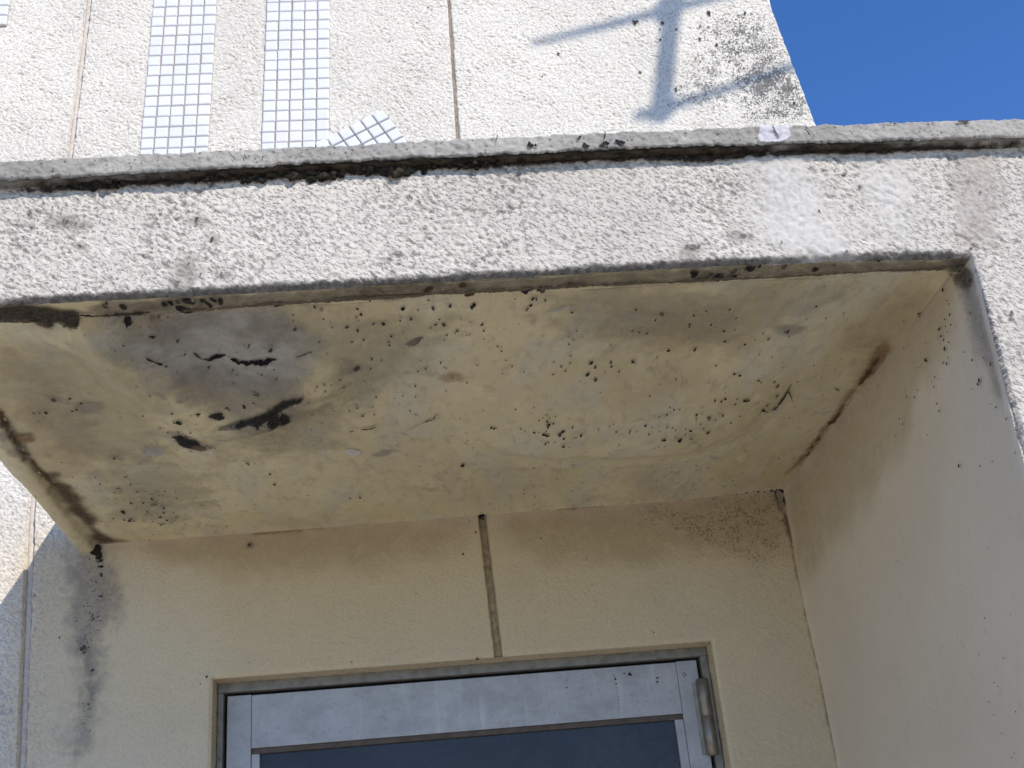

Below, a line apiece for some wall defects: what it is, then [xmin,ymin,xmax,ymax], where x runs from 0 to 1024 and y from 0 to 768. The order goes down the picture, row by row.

water stain [0,298,320,397]
peeling [159,391,303,452]
water stain [794,346,889,467]
water stain [0,411,177,672]